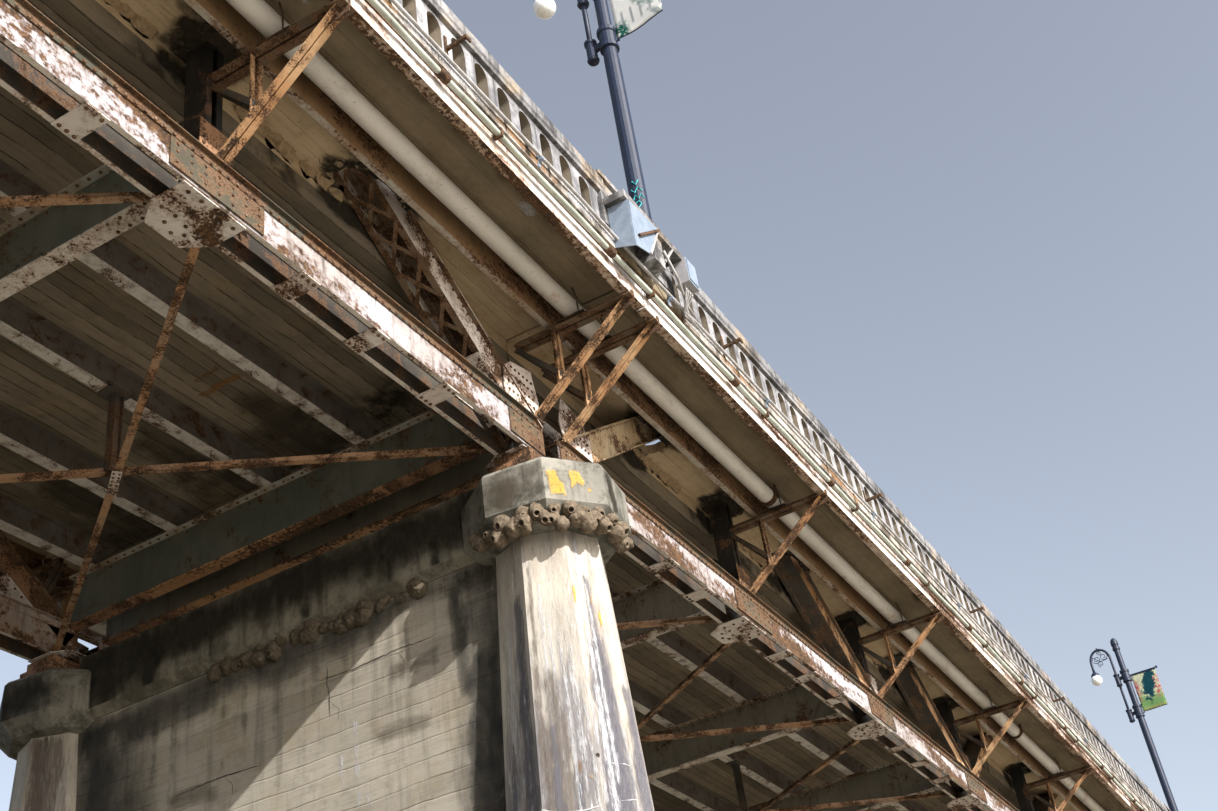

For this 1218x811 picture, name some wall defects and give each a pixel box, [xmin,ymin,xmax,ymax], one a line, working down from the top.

damp [43,480,143,543]
damp [138,432,209,481]
damp [606,473,618,513]
damp [80,469,534,708]
damp [79,603,402,811]
damp [433,540,653,811]
damp [25,737,64,811]